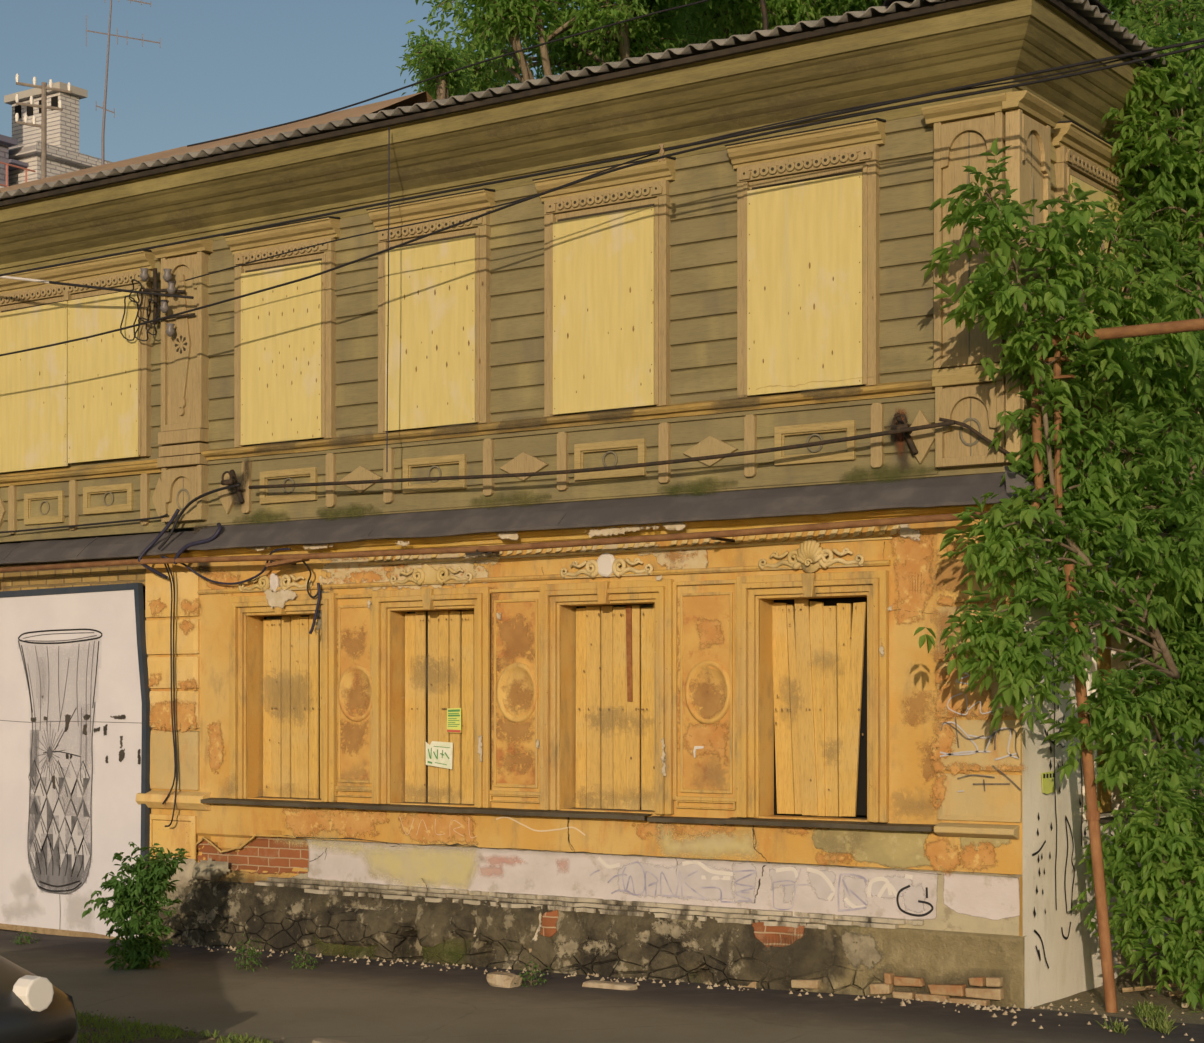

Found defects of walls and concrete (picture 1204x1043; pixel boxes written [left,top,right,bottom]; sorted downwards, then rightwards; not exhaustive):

peeling [497,531,518,540]
peeling [580,522,708,580]
peeling [303,541,540,783]
peeling [660,601,730,776]
peeling [887,524,1024,809]
peeling [150,679,224,774]
flaking render [196,808,475,875]
peeling [925,838,998,874]
peeling [196,886,274,925]
peeling [290,899,307,918]
peeling [340,903,390,911]
flaking render [728,922,805,969]